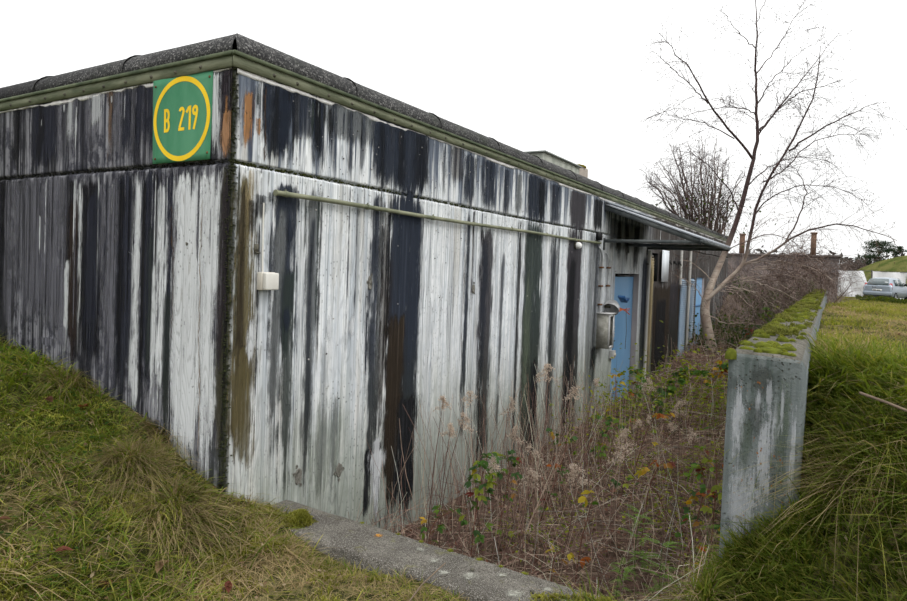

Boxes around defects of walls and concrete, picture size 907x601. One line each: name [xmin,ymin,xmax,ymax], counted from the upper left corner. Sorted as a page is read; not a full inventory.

damp [29,100,65,167]
damp [121,82,153,157]
corrosion [217,70,233,155]
corrosion [244,92,261,145]
damp [0,183,10,280]
damp [61,178,102,362]
damp [113,168,175,430]
damp [210,78,453,525]
damp [460,153,605,480]
damp [751,366,791,486]